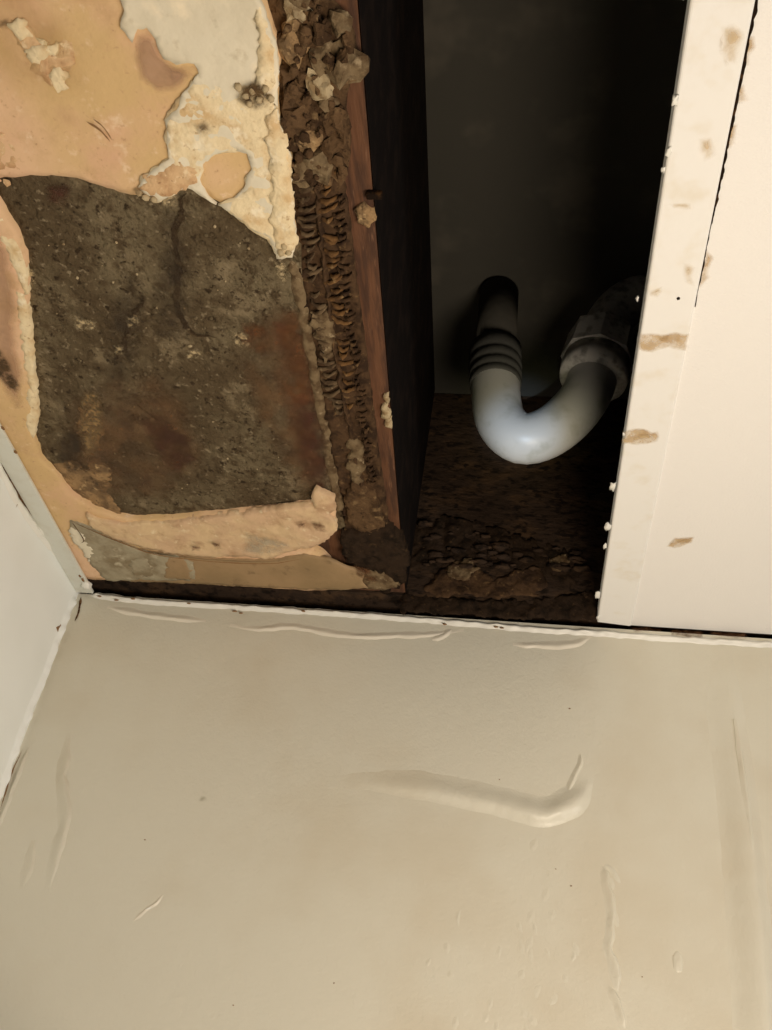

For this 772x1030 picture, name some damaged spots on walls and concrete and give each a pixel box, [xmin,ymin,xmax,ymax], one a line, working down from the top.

flaking render [0,0,373,590]
peeling [383,392,393,429]
peeling [0,514,772,826]